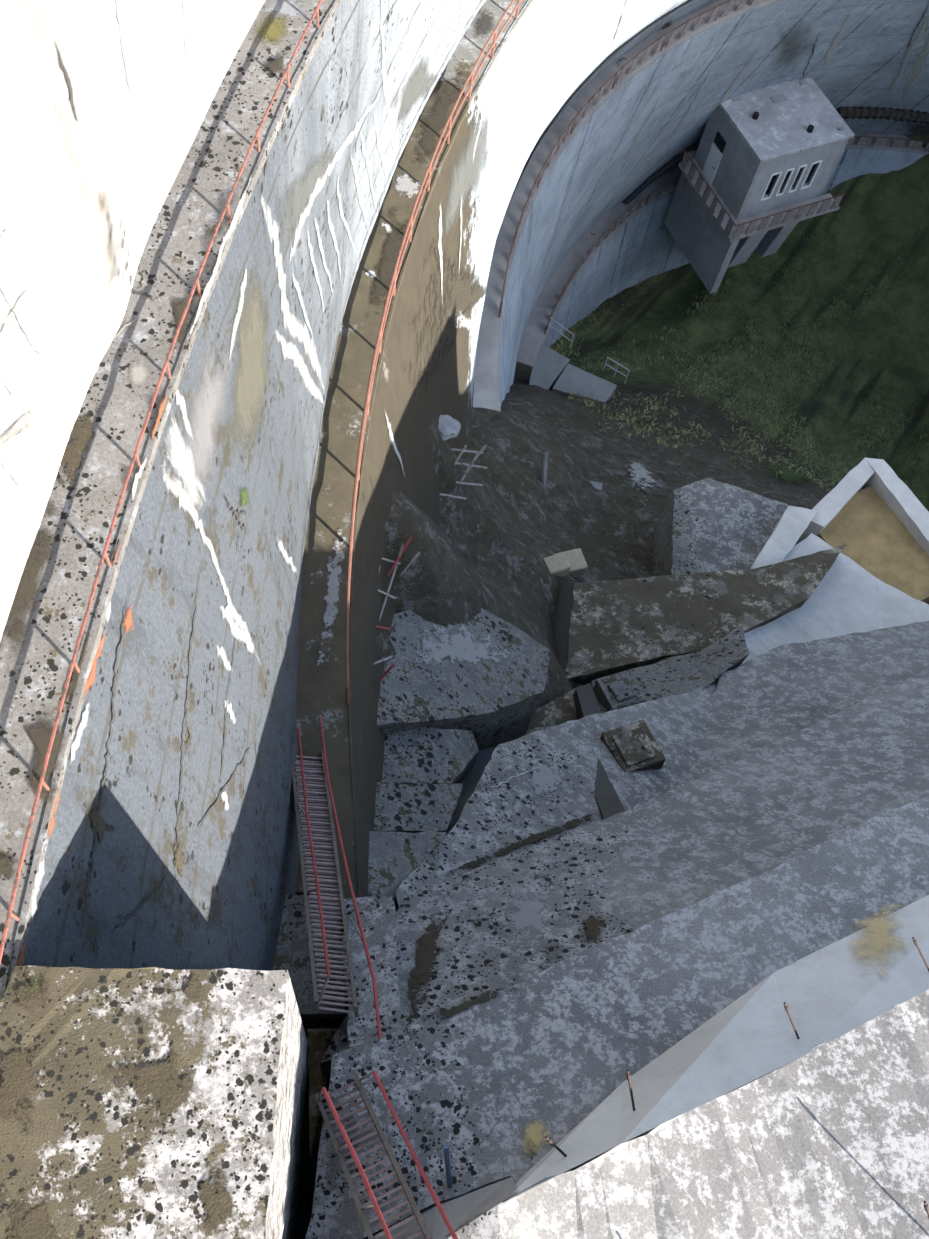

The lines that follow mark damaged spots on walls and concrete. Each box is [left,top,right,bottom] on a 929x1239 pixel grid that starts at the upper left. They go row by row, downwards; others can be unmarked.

crack [902,2,929,56]
water stain [21,0,87,196]
crack [0,278,40,355]